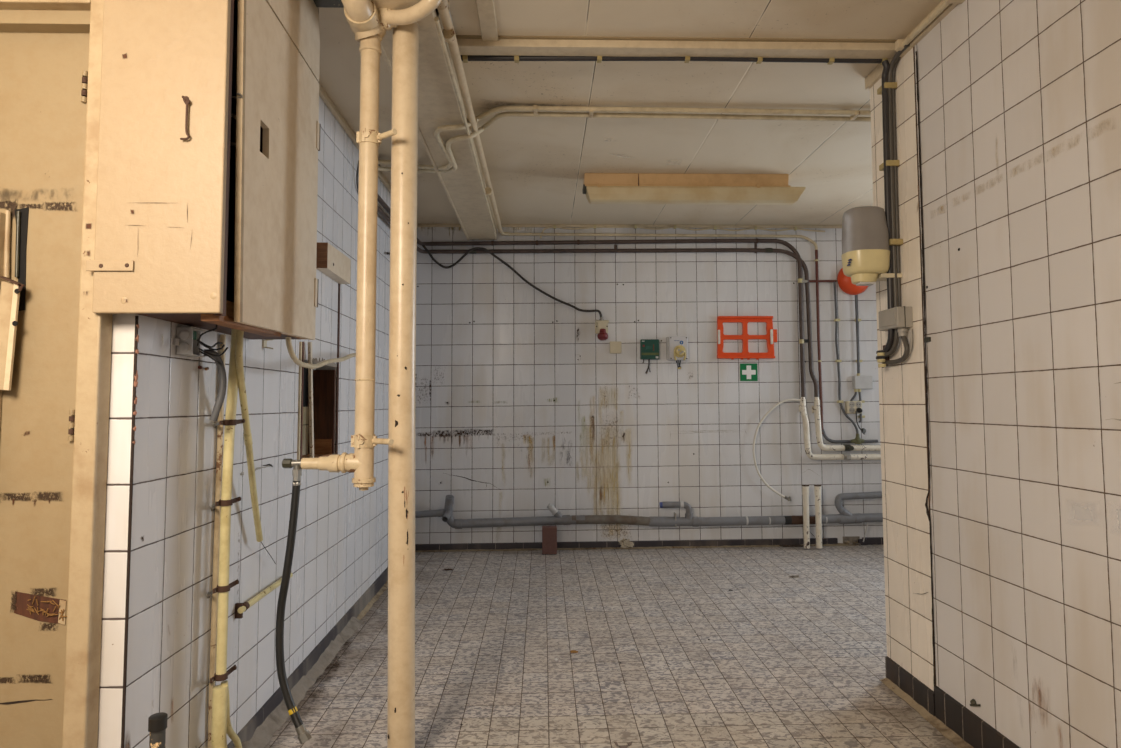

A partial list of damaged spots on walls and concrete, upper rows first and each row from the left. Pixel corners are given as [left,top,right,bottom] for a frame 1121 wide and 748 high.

peeling [0,201,72,217]
corrosion [418,430,492,454]
spalling [33,588,54,596]